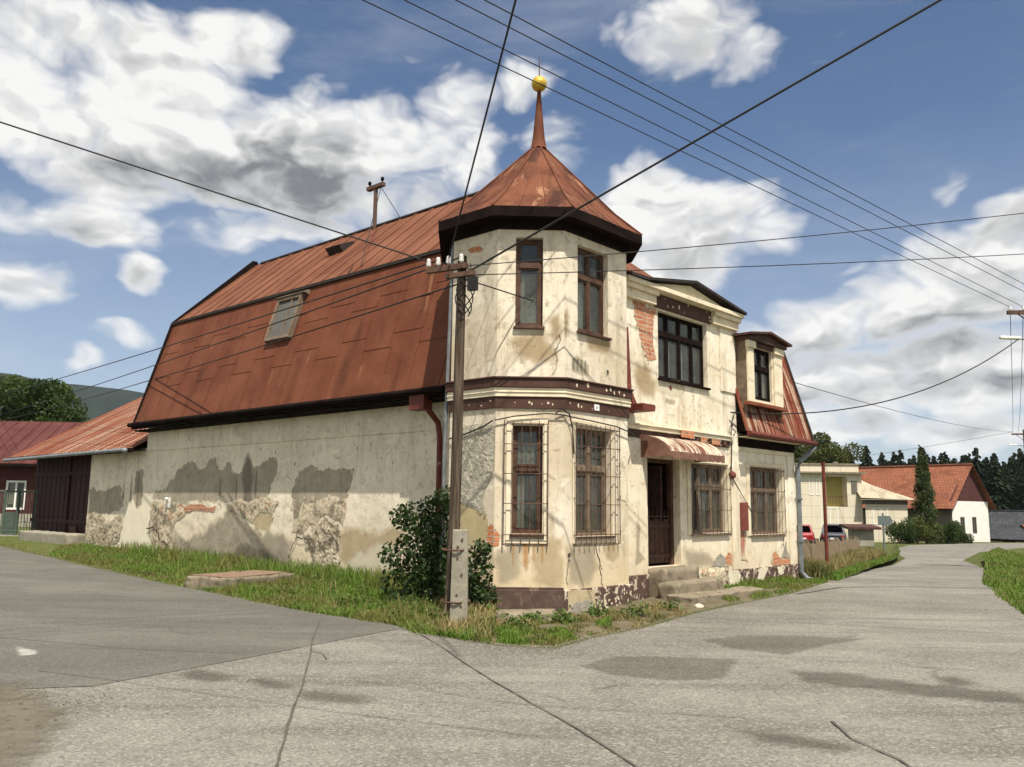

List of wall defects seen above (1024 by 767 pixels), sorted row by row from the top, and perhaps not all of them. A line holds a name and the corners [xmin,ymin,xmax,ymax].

flaking render [632,298,689,363]
flaking render [85,485,123,546]
peeling [148,447,396,576]
flaking render [461,424,500,546]
flaking render [566,551,629,613]